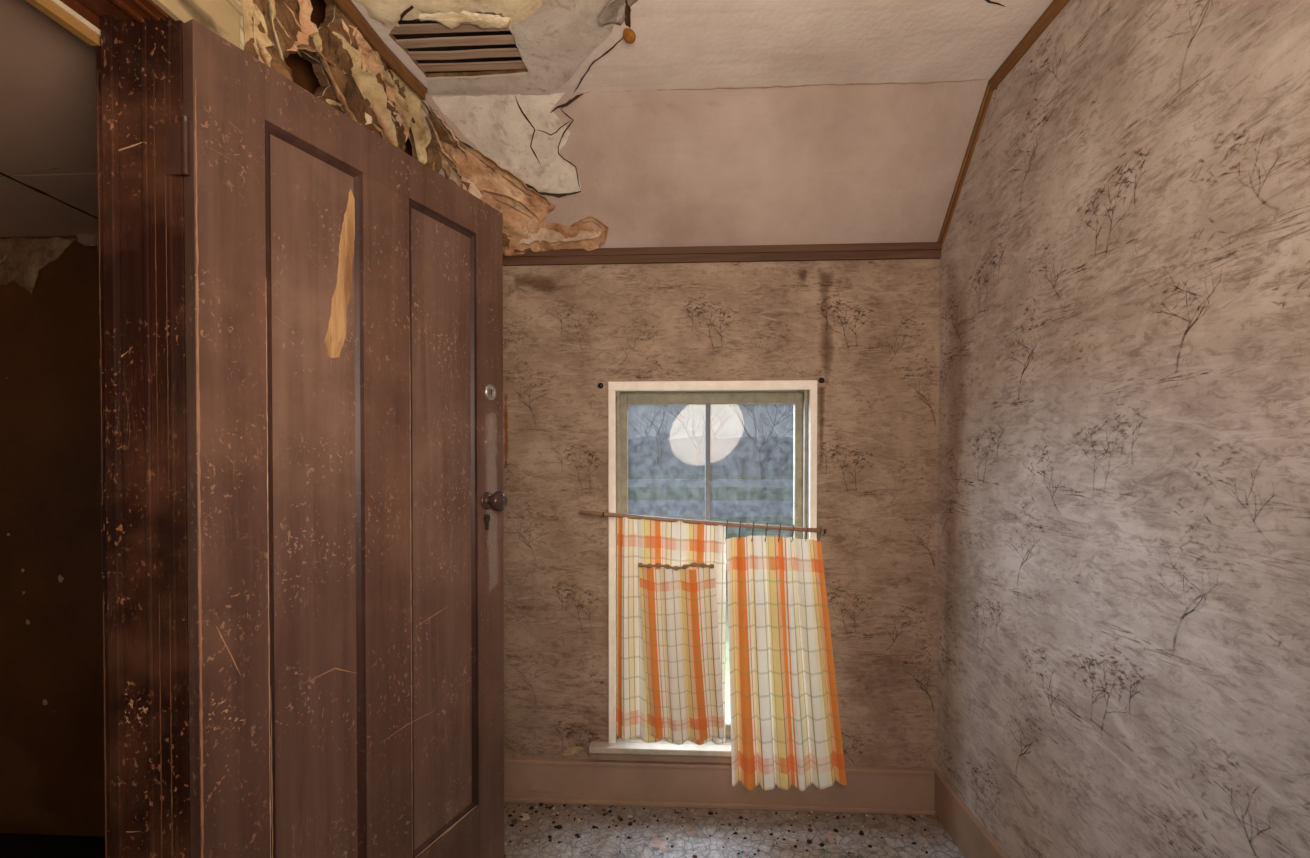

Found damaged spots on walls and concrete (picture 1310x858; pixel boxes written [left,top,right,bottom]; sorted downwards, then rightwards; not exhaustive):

flaking render [239,0,638,252]
peeling [0,234,98,294]